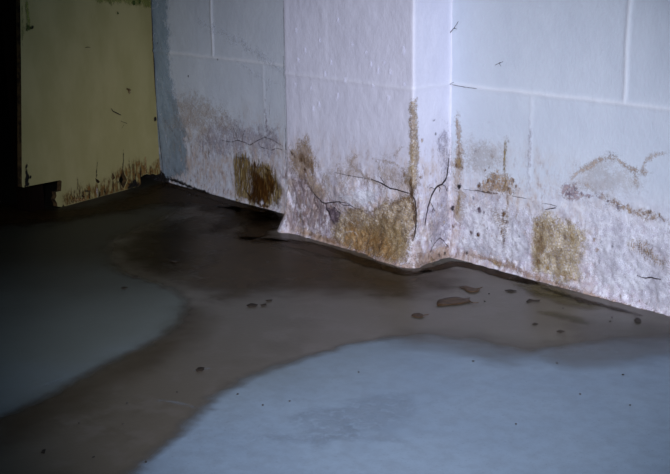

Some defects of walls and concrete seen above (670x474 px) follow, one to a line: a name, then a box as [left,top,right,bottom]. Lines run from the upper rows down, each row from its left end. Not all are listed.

leakage [64,0,207,205]
crack [223,130,287,184]
crack [310,189,356,214]
crack [339,155,450,237]
leakage [562,153,663,200]
leakage [0,176,670,474]